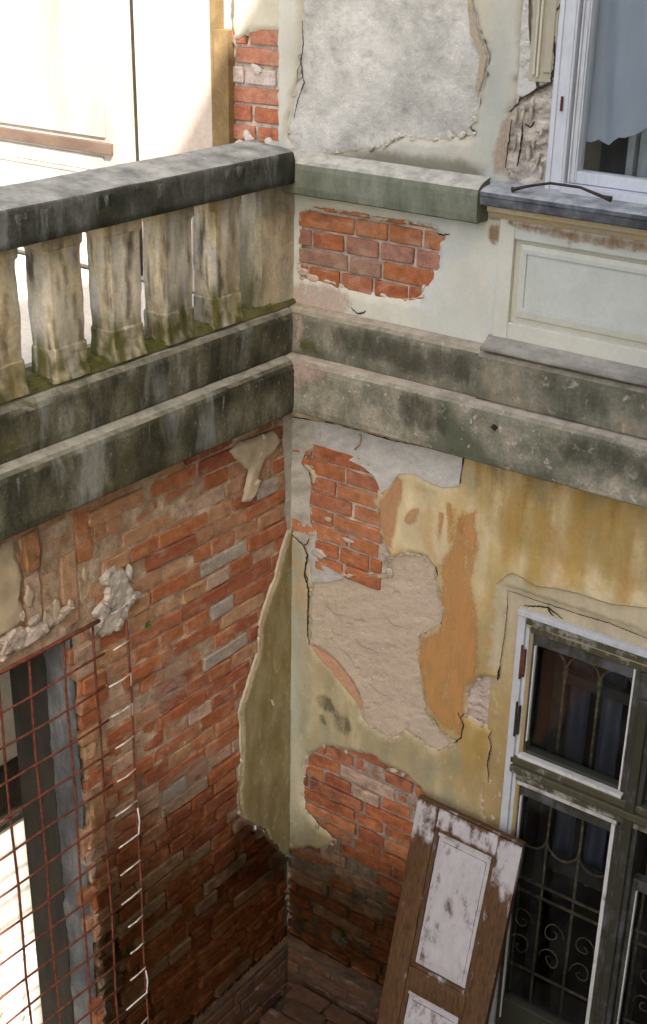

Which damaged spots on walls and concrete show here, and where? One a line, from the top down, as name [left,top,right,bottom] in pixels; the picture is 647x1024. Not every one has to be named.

crack [294,21,305,118]
flaking render [232,0,490,154]
spalling [513,0,543,180]
flaking render [296,206,446,301]
damp [294,364,315,385]
peeling [0,640,12,662]
flaking render [20,585,75,633]
peeling [102,564,144,631]
crack [292,535,310,645]
flaking render [237,417,462,835]
crack [497,590,647,681]
flaking render [287,744,426,930]